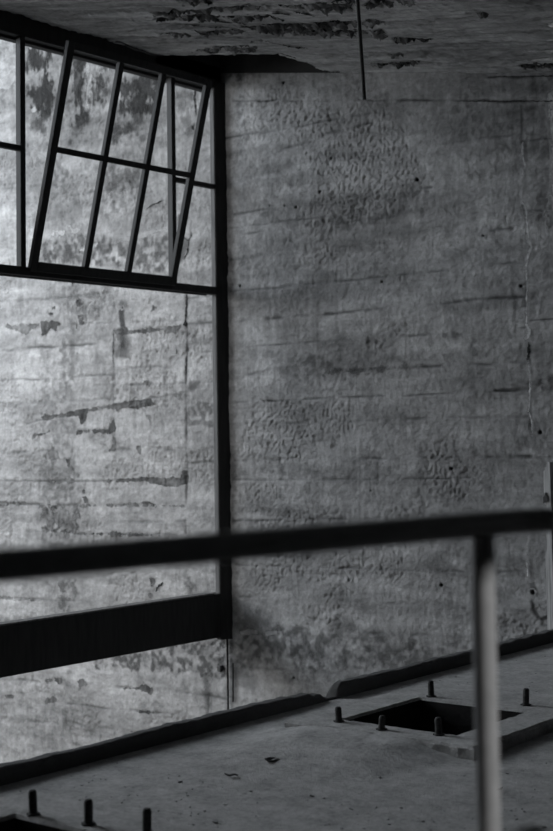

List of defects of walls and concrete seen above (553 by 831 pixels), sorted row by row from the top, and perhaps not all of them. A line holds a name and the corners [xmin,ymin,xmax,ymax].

spalling [153,0,431,69]
spalling [521,62,553,71]